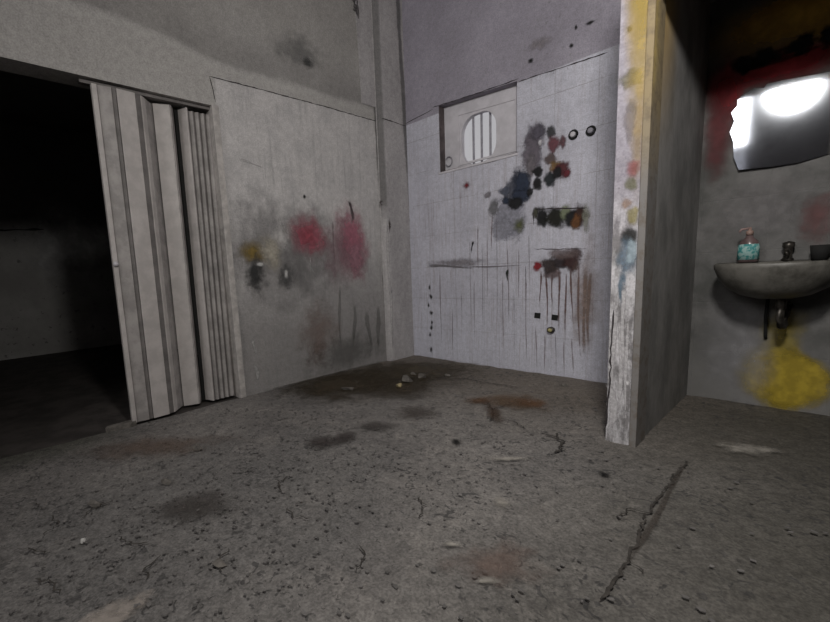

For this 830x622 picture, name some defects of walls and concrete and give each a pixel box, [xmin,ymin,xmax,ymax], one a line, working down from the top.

water stain [299,363,465,399]
crack [600,461,688,600]